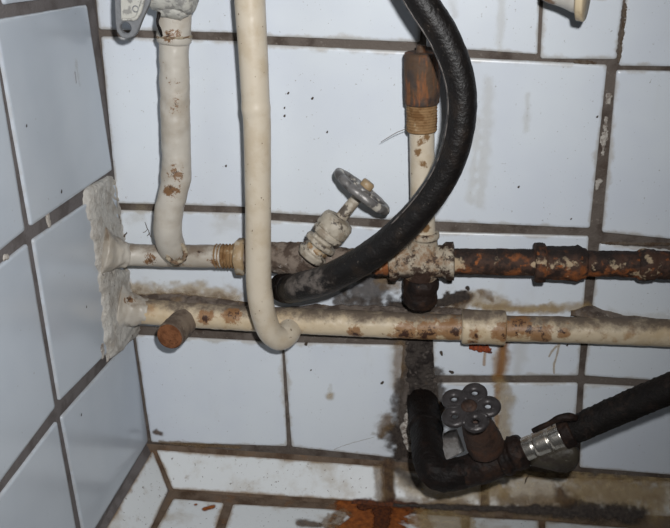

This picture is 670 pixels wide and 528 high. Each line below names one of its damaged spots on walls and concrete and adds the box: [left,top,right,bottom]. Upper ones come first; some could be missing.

rust [497,343,506,376]
rust [296,459,646,528]